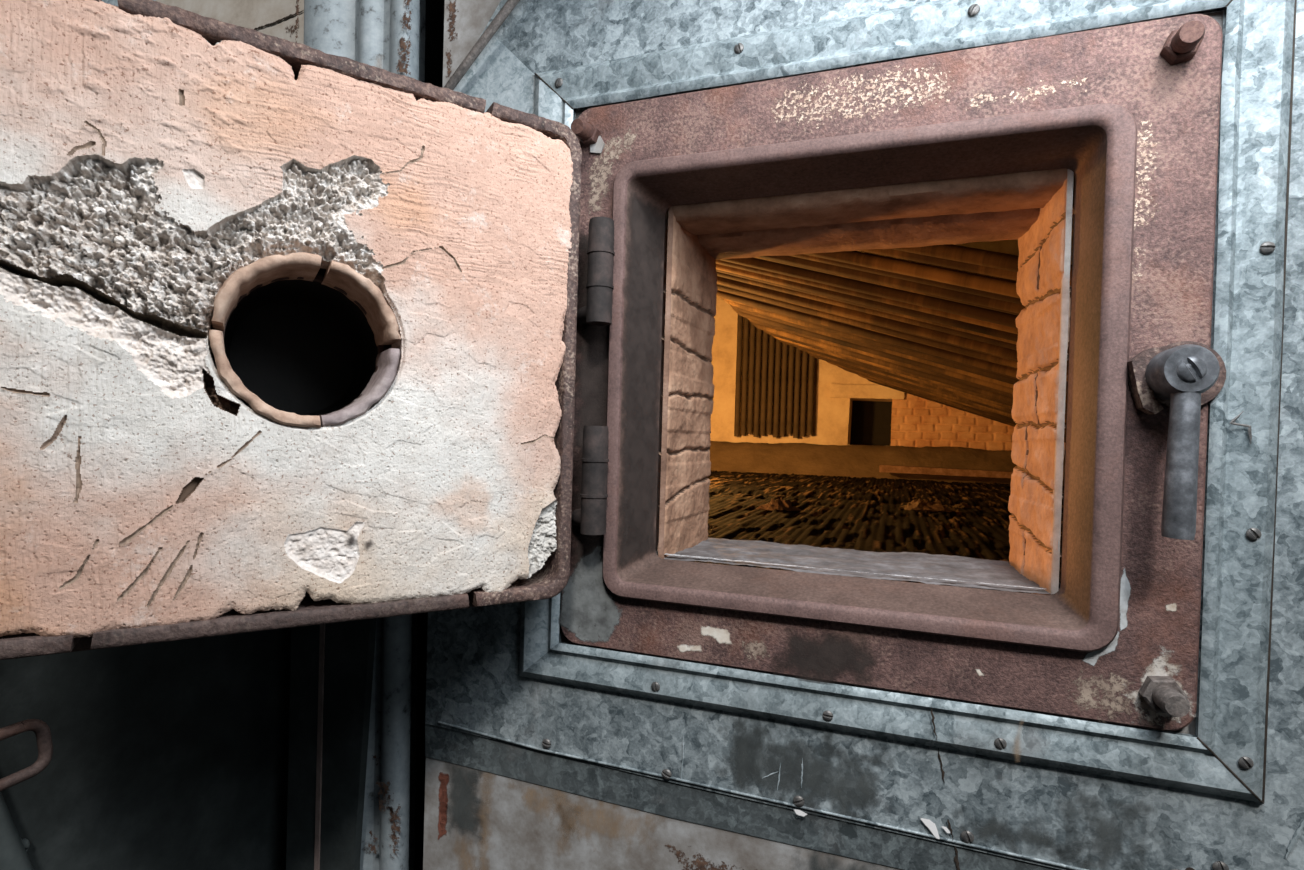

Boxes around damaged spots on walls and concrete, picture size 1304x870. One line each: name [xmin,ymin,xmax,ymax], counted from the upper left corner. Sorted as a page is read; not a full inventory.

corrosion [396,0,412,76]
corrosion [446,0,459,78]
crack [0,260,208,339]
spalling [0,154,390,416]
peeling [284,521,365,583]
corrosion [438,772,449,840]
corrosion [665,845,744,870]